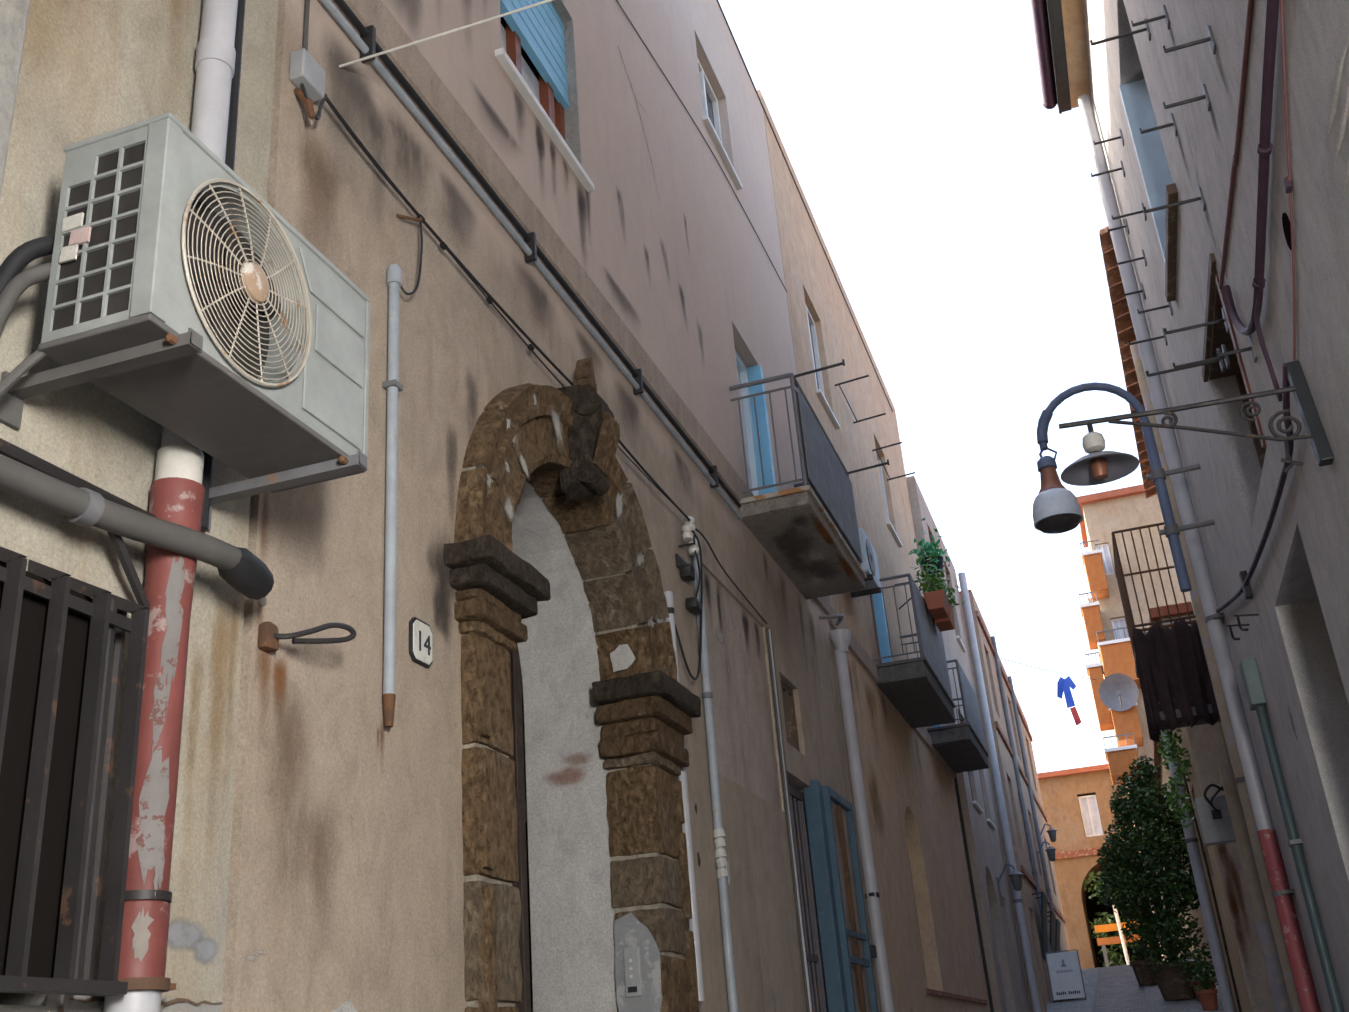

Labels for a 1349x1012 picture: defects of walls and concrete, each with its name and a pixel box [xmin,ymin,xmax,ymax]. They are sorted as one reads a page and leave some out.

leakage [537,128,555,161]
leakage [579,192,588,219]
corrosion [263,657,285,696]